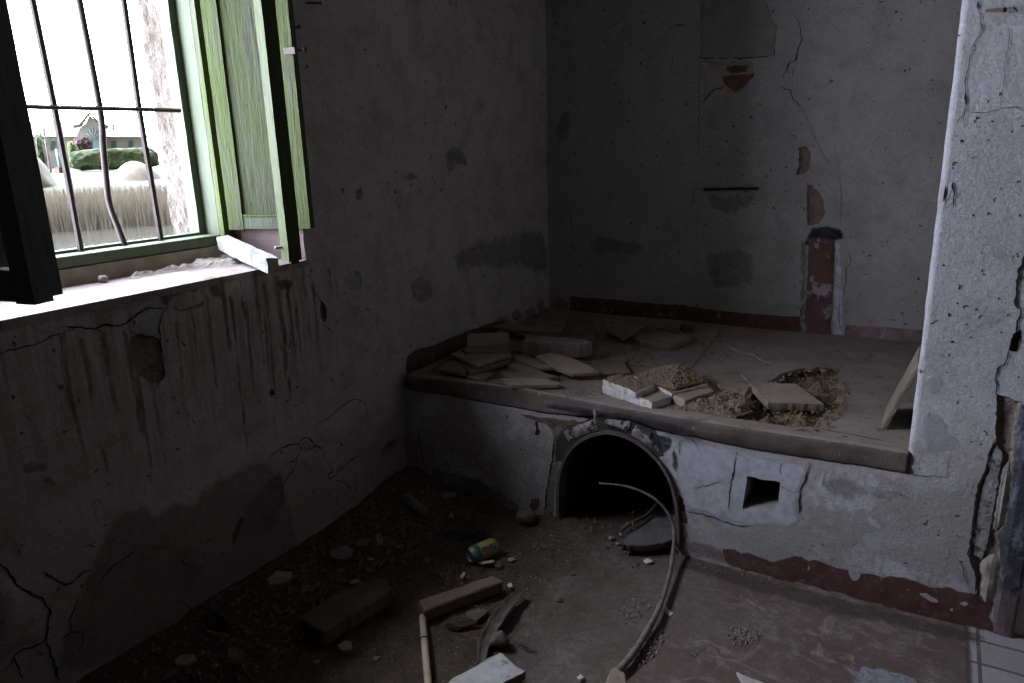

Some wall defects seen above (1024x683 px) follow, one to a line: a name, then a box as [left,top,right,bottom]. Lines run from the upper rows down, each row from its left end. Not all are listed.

crack [699,4,842,225]
crack [958,0,1023,127]
spalling [796,145,825,226]
flaking render [833,243,844,335]
crack [1,304,204,415]
crack [226,399,368,545]
crack [685,453,747,527]
crack [780,462,810,514]
spalling [950,256,1024,611]
crack [0,499,134,681]